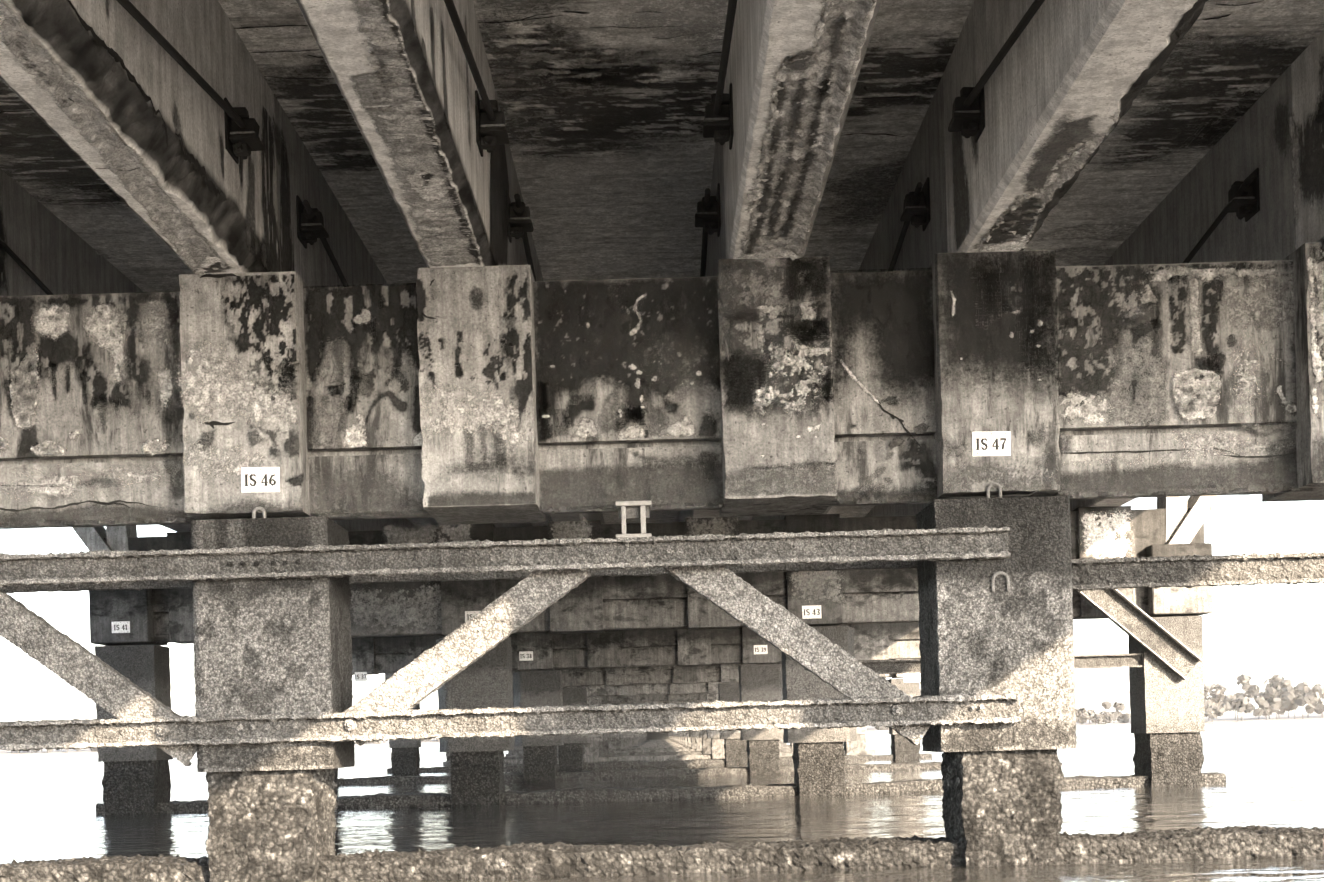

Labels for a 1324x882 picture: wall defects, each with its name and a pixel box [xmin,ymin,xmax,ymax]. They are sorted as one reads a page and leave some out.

leakage [474,0,728,159]
leakage [846,35,958,122]
leakage [1101,26,1314,168]
leakage [0,57,1324,559]
crack [872,395,921,447]
crack [0,483,162,517]